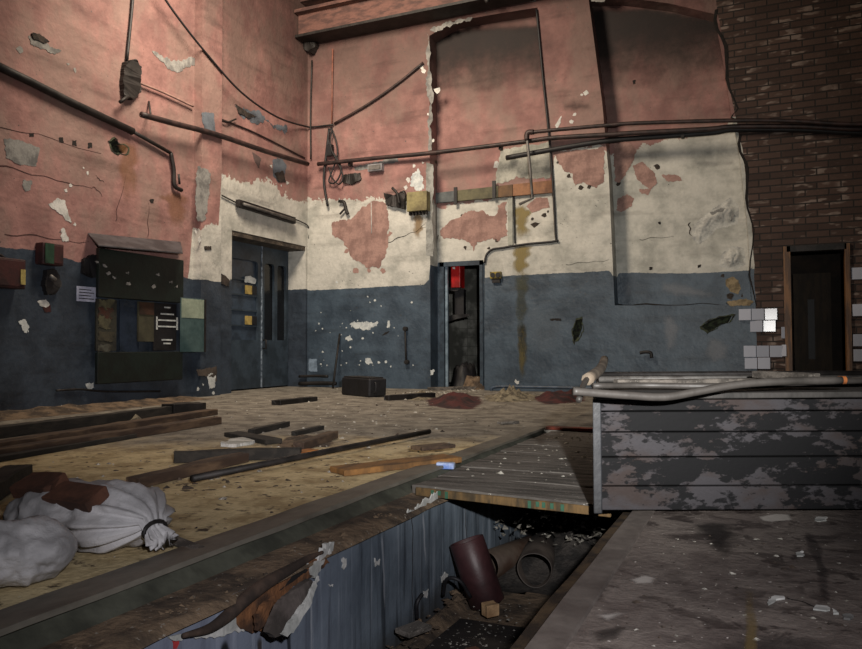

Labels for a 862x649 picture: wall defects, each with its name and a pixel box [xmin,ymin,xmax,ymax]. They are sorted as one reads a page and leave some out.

crack [0,127,101,154]
peeling [49,183,76,242]
crack [0,165,126,220]
peeling [194,166,211,250]
peeling [252,152,289,187]
peeling [331,201,392,274]
peeling [527,197,550,228]
peeling [494,142,682,212]
peeling [308,351,327,372]
peeling [341,320,395,352]
spalling [143,491,561,649]